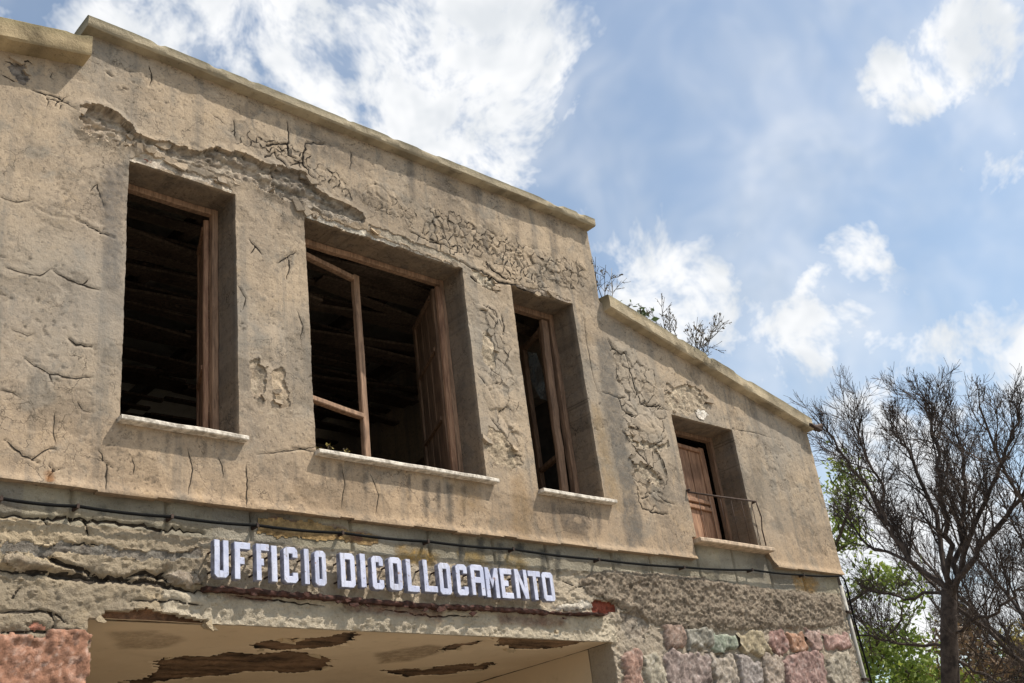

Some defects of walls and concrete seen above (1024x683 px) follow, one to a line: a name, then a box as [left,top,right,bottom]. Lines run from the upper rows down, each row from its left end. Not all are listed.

crack [3,60,76,109]
crack [83,184,113,238]
flaking render [79,105,460,268]
crack [6,267,99,290]
crack [213,115,672,515]
crack [14,330,91,412]
flaking render [249,359,290,409]
crack [98,450,135,487]
flaking render [0,540,203,589]
flaking render [95,608,218,632]
flaking render [118,632,361,683]
flaking render [379,630,584,677]